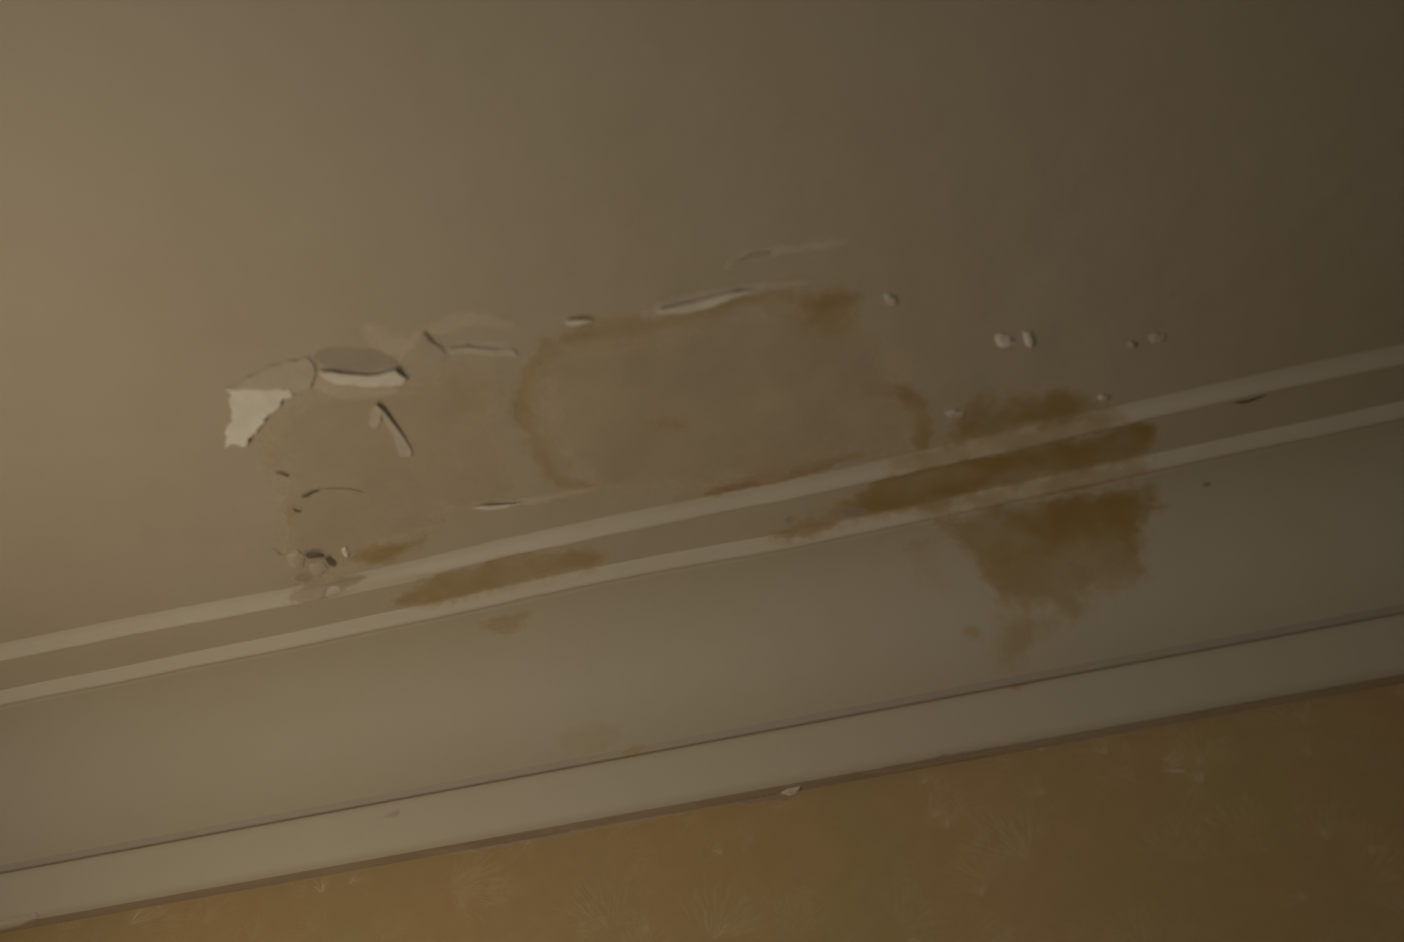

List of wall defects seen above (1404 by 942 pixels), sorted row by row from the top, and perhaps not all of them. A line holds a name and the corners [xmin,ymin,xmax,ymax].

peeling [223,348,412,457]
spalling [305,552,336,566]
water stain [396,551,600,605]
water stain [832,384,1163,651]